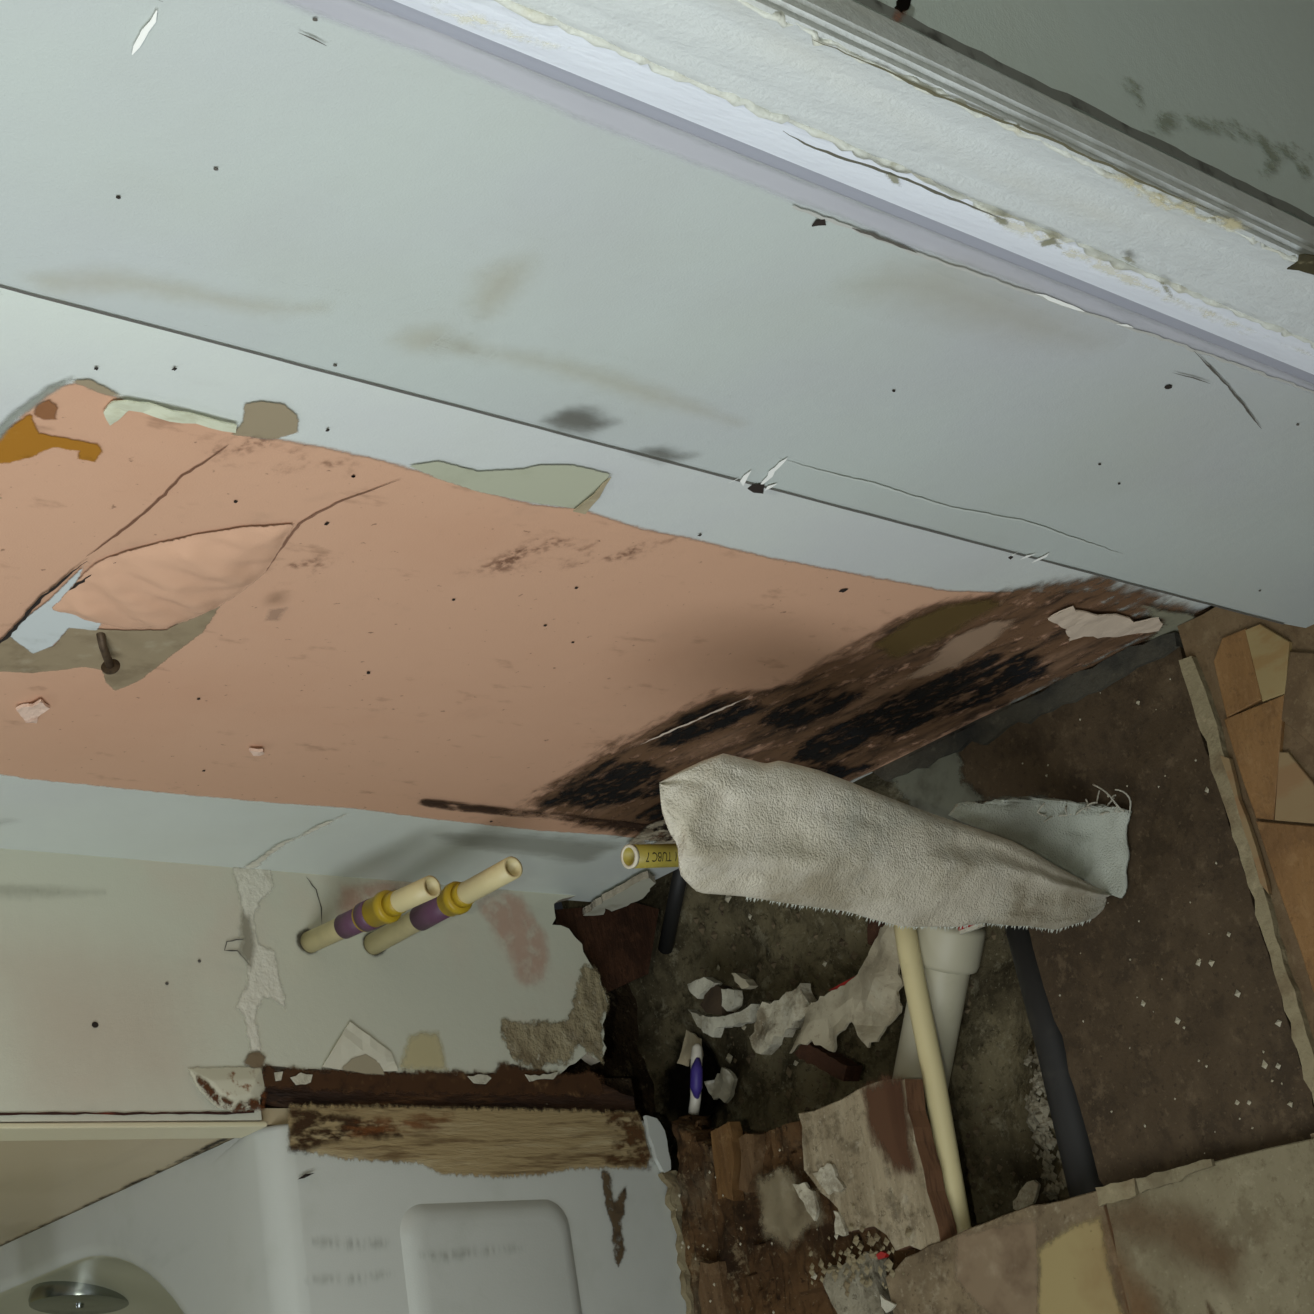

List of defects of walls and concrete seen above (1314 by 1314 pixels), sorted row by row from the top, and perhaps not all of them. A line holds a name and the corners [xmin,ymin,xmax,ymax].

crack [783,131,1008,225]
crack [852,228,917,253]
crack [1040,239,1061,248]
crack [0,285,1284,624]
peeling [0,380,1068,844]
leakage [420,577,1208,842]
flaking render [500,964,609,1070]